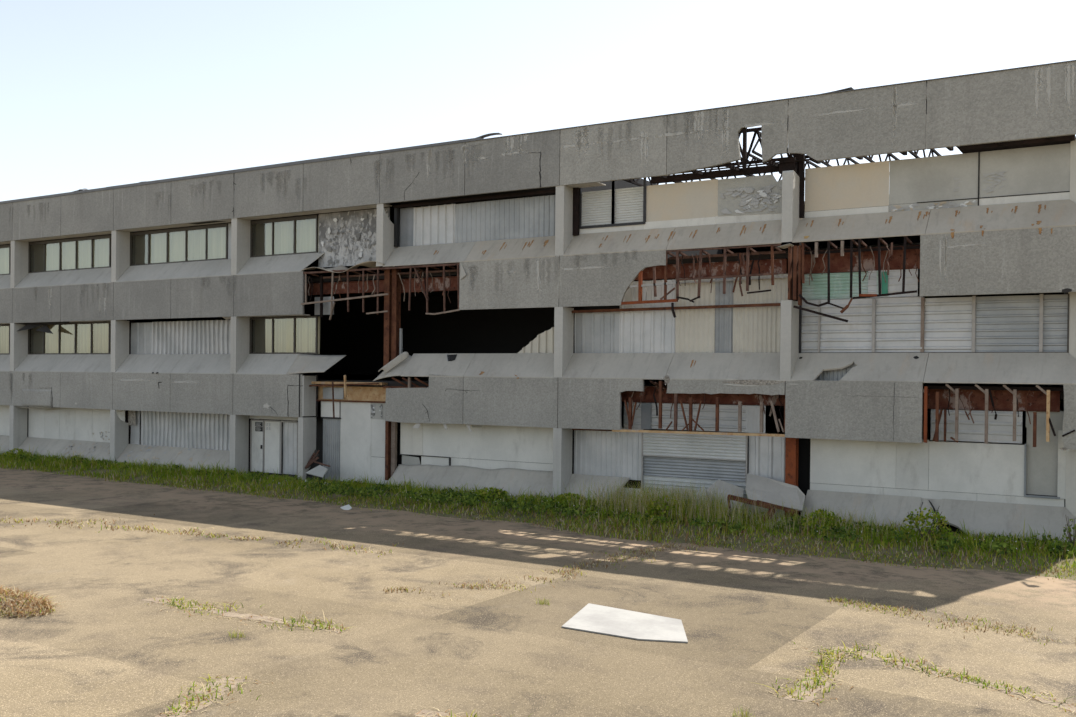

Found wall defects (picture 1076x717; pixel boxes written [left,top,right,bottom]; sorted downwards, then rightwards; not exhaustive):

peeling [318,213,388,266]